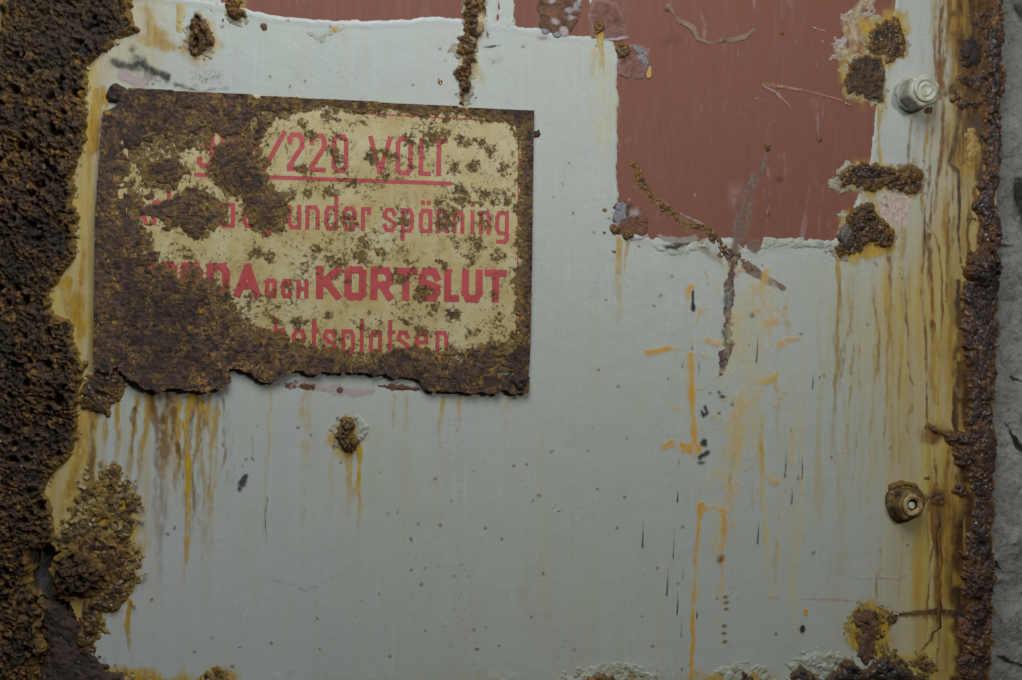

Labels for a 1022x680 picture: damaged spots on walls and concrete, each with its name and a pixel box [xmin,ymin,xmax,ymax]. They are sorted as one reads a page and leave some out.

peeling [829,0,876,62]
peeling [652,228,719,256]
peeling [745,237,831,253]
corrosion [686,285,708,323]
corrosion [0,0,541,680]
corrosion [645,346,677,355]
corrosion [828,0,1008,680]
corrosion [661,352,720,464]
corrosion [750,434,780,509]
corrosion [689,497,734,679]
corrosion [740,667,760,680]
corrosion [790,651,929,680]